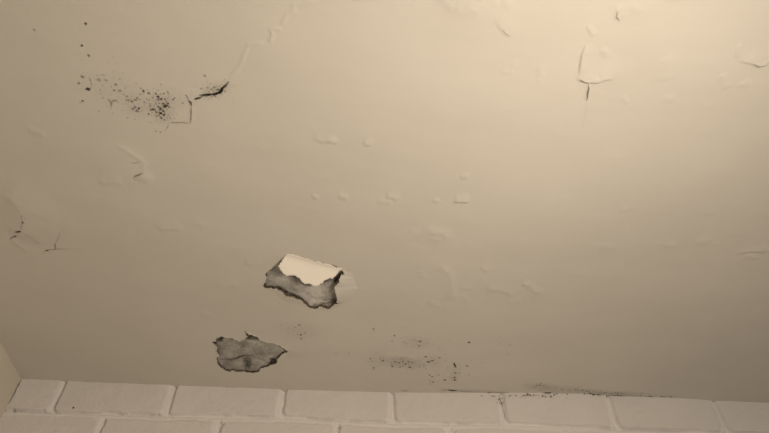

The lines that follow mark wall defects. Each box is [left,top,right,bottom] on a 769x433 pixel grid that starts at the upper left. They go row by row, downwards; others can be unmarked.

peeling [262,254,358,310]
spalling [212,331,288,373]